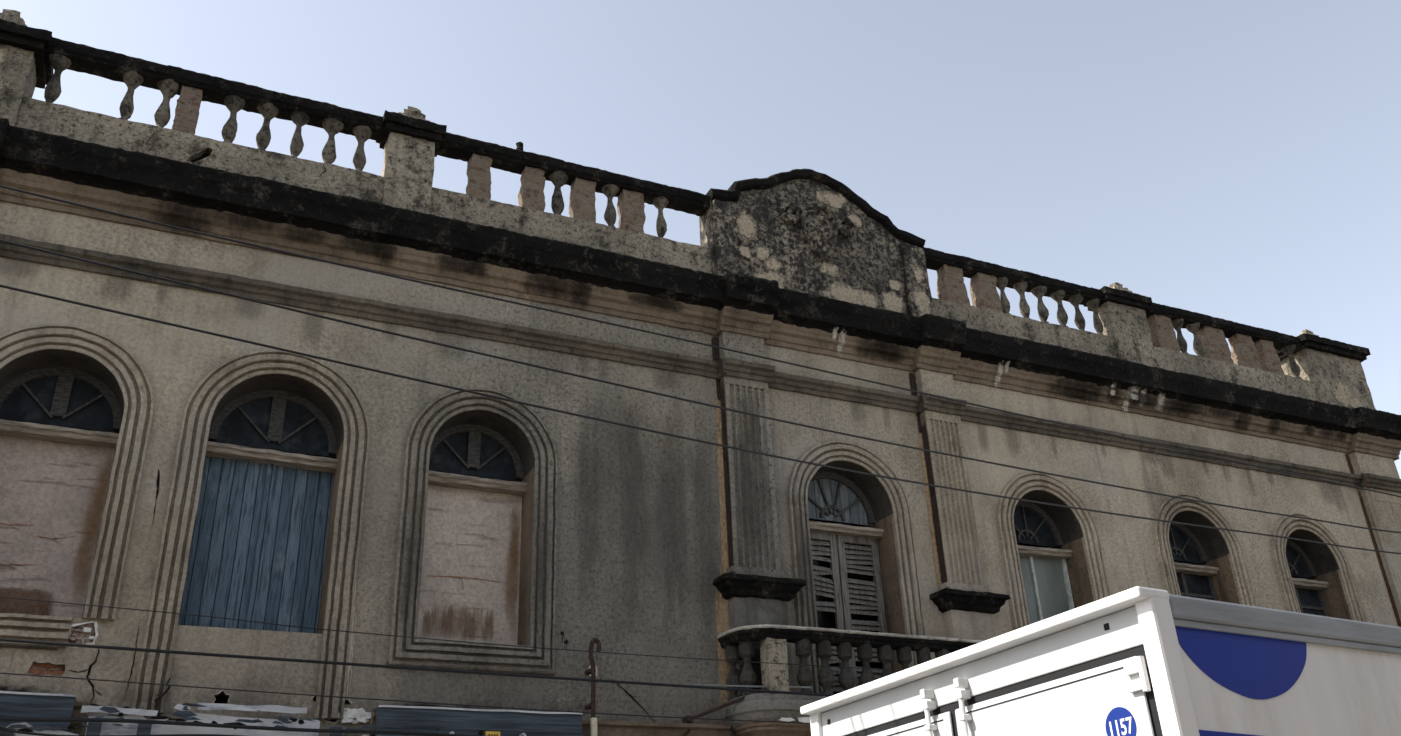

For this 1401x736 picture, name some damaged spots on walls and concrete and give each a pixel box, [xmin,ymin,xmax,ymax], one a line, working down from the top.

flaking render [816,191,862,227]
water stain [229,213,325,243]
water stain [344,236,394,262]
flaking render [737,211,785,288]
water stain [526,273,592,305]
flaking render [820,263,931,317]
water stain [994,362,1009,387]
water stain [1052,377,1251,430]
water stain [711,336,733,567]
spalling [67,620,98,645]
spalling [25,660,68,678]
crack [69,622,171,710]